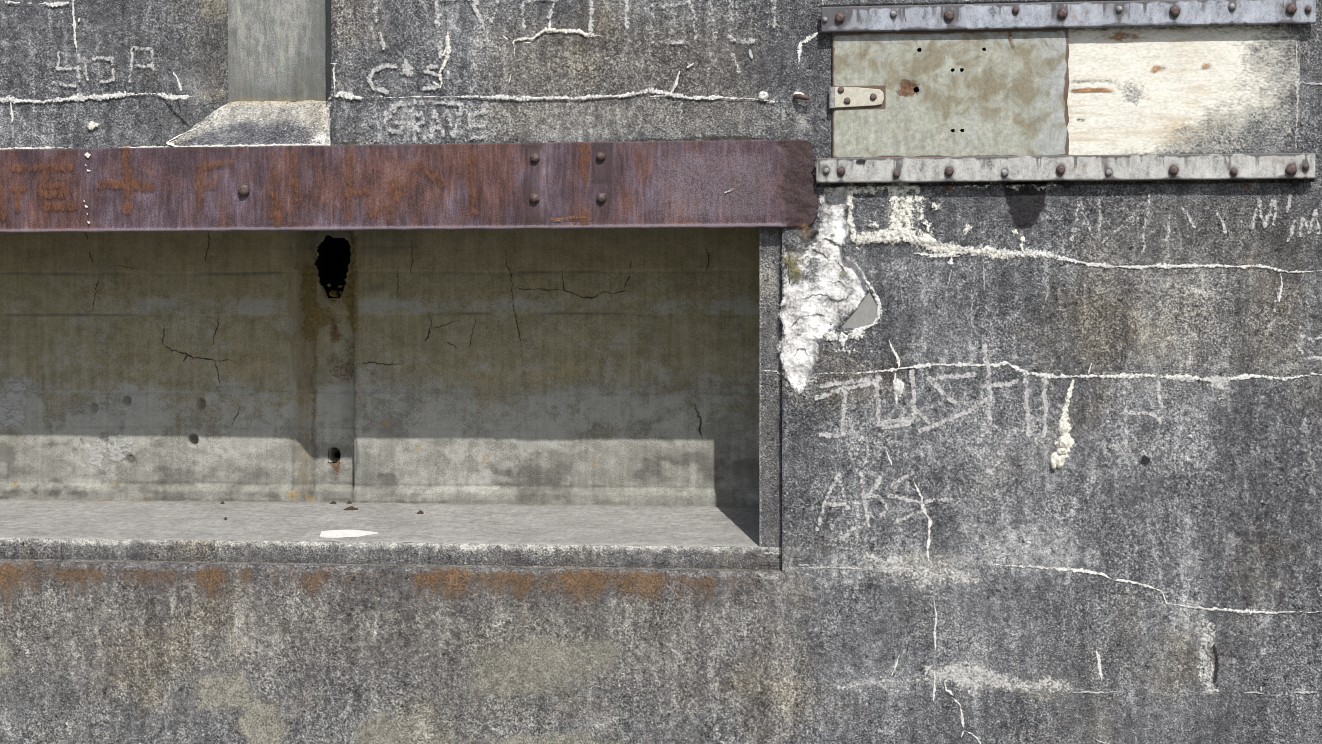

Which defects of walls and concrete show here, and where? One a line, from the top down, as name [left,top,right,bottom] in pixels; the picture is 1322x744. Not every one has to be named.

leakage [844,181,1056,260]
spalling [314,235,351,303]
crack [505,250,632,347]
spalling [777,187,882,399]
crack [915,243,1321,323]
crack [162,320,232,383]
crack [819,340,1322,381]
corrosion [415,567,714,601]
crack [994,564,1321,614]